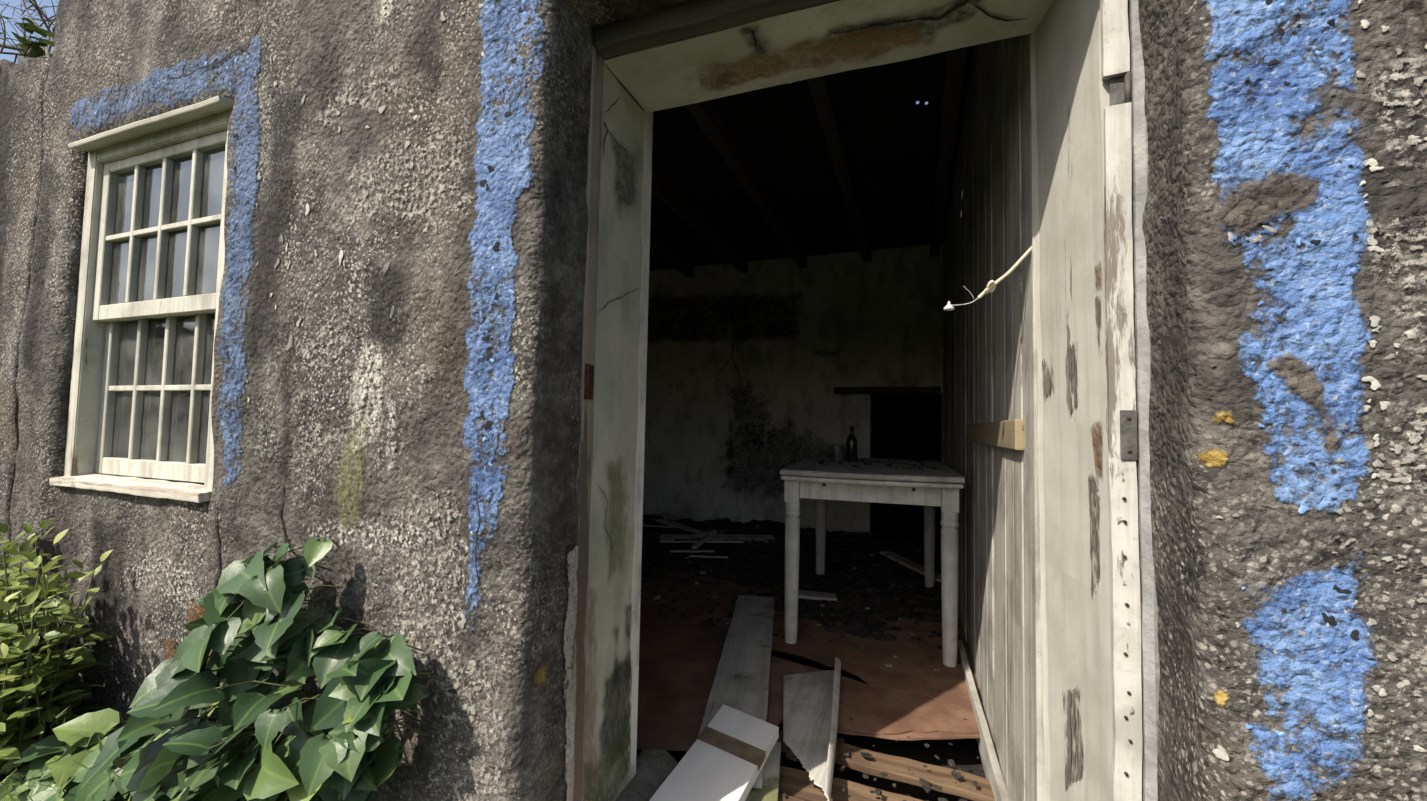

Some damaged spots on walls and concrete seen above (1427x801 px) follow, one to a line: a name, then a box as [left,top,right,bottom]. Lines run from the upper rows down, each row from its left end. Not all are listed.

flaking render [316,63,407,133]
crack [830,0,1028,34]
flaking render [298,422,336,457]
peeling [346,0,546,801]
peeling [1203,0,1427,801]
flaking render [563,545,578,801]
leakage [583,605,632,801]